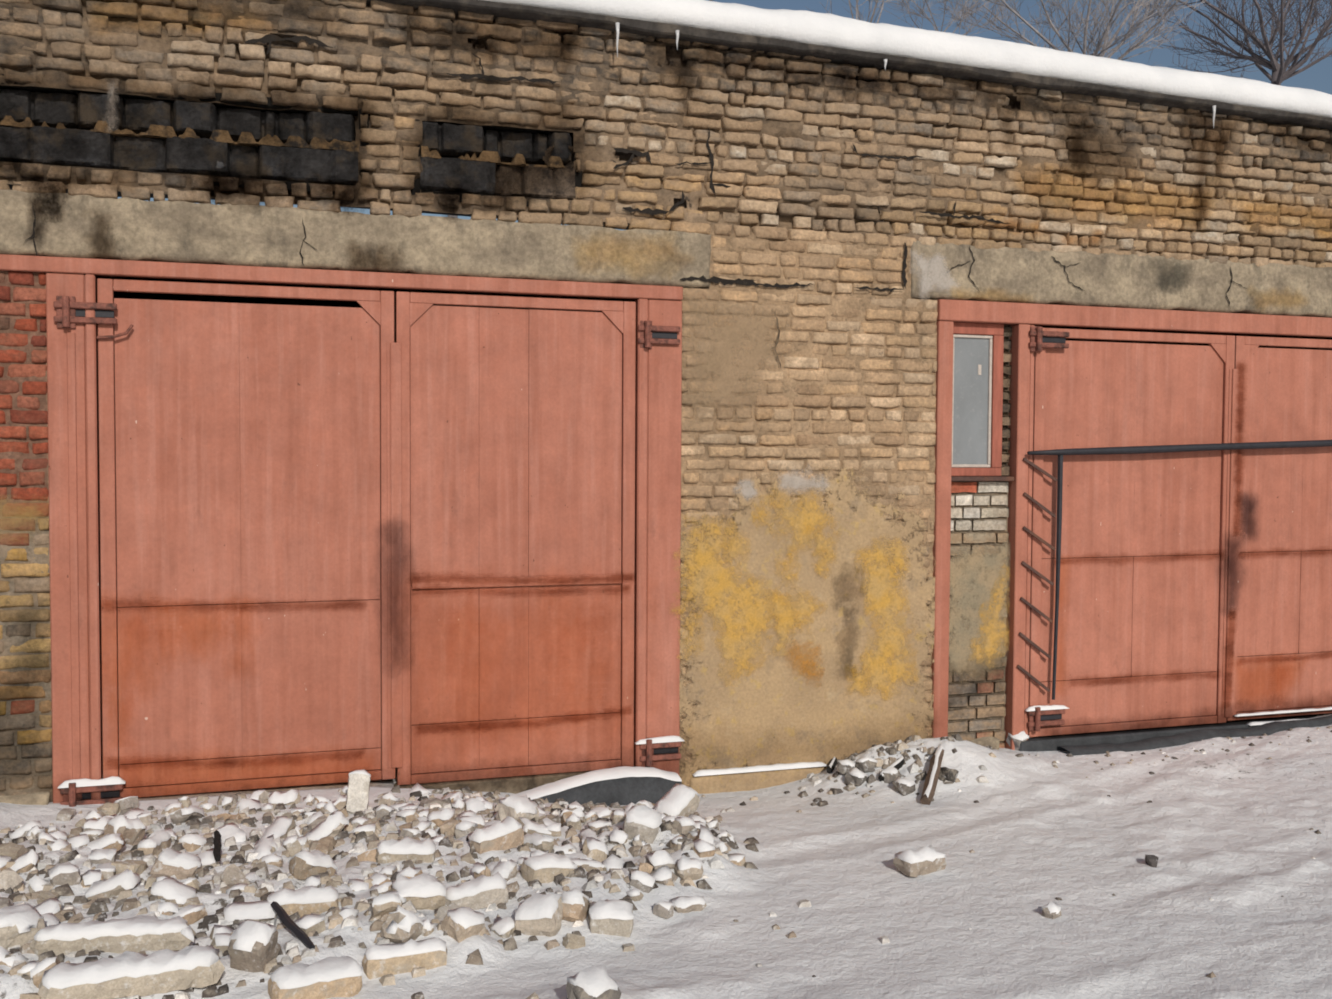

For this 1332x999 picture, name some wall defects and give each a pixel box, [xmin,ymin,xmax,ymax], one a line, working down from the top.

crack [853,242,908,292]
crack [919,202,1011,290]
crack [1051,256,1085,291]
crack [1226,267,1247,306]